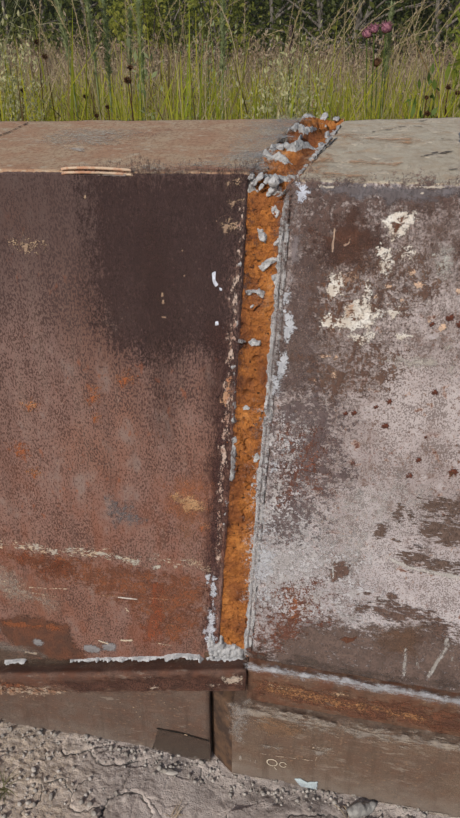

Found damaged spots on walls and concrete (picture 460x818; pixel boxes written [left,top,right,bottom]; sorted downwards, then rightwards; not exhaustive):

peeling [308,181,460,288]
spalling [212,112,345,567]
peeling [319,271,406,345]
rust [247,131,460,659]
rust [0,615,86,661]
rust [0,546,212,649]
peeling [203,574,218,649]
damp [243,494,332,610]
damp [245,663,460,704]